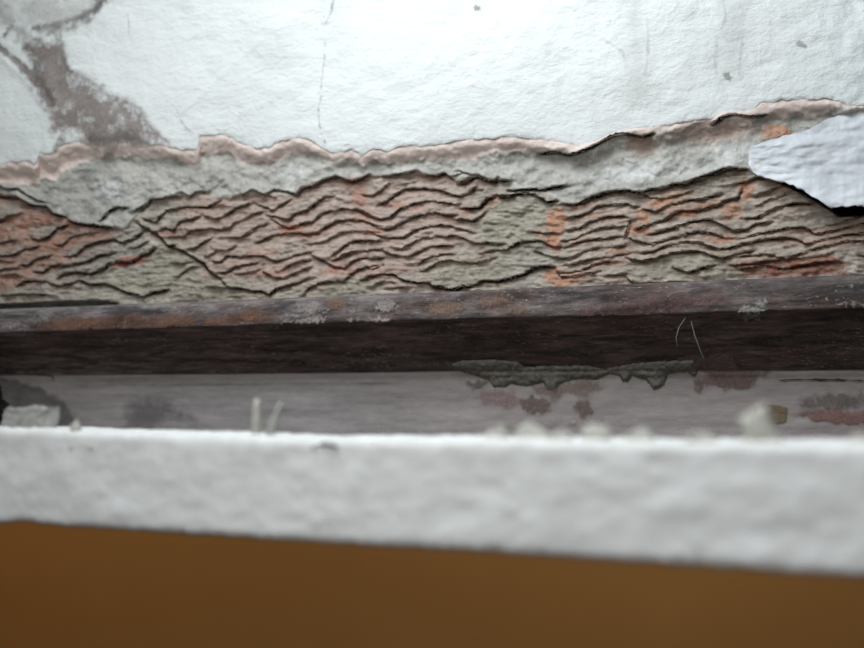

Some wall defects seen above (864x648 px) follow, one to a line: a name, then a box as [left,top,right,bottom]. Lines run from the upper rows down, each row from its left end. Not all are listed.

spalling [0,98,864,305]